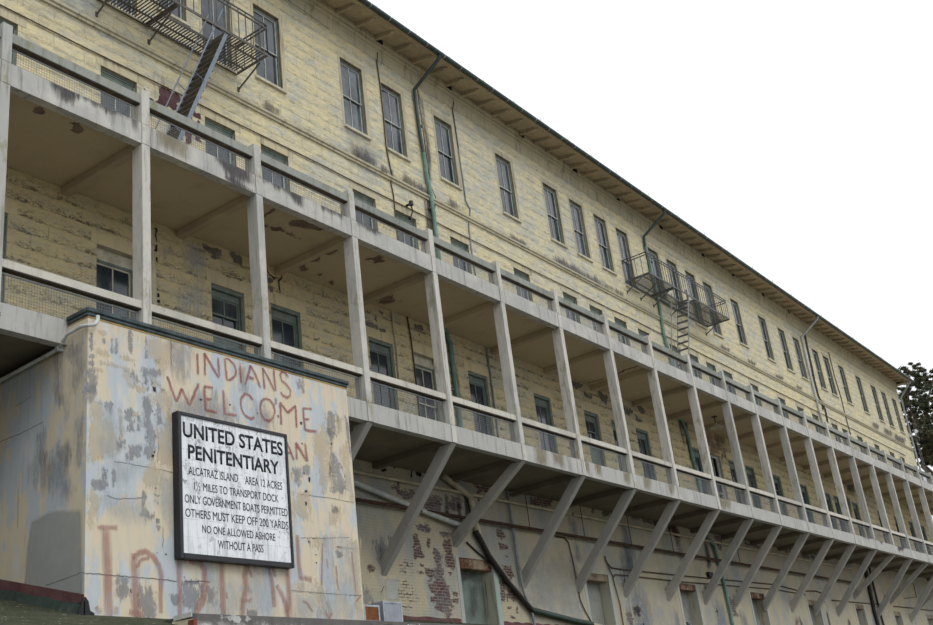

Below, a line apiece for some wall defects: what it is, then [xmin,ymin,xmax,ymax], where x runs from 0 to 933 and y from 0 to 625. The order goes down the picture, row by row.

damp [52,82,121,114]
peeling [144,86,181,111]
damp [217,159,250,189]
spalling [264,209,325,239]
spalling [424,494,463,512]
spalling [396,521,459,619]
spalling [496,528,518,619]